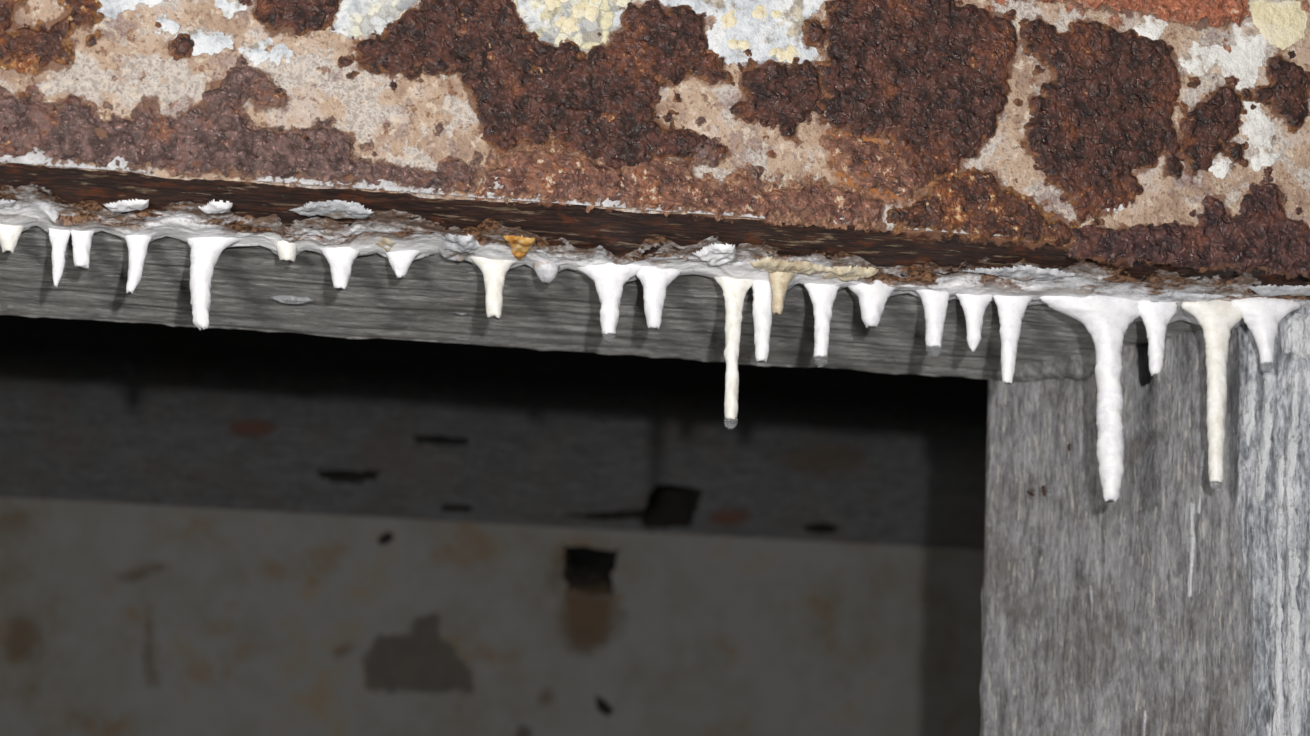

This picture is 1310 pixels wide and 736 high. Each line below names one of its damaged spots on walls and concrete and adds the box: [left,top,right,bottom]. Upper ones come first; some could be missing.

water stain [0,147,146,173]
rust [0,0,1310,279]
hole [562,546,619,598]
water stain [0,169,1310,736]